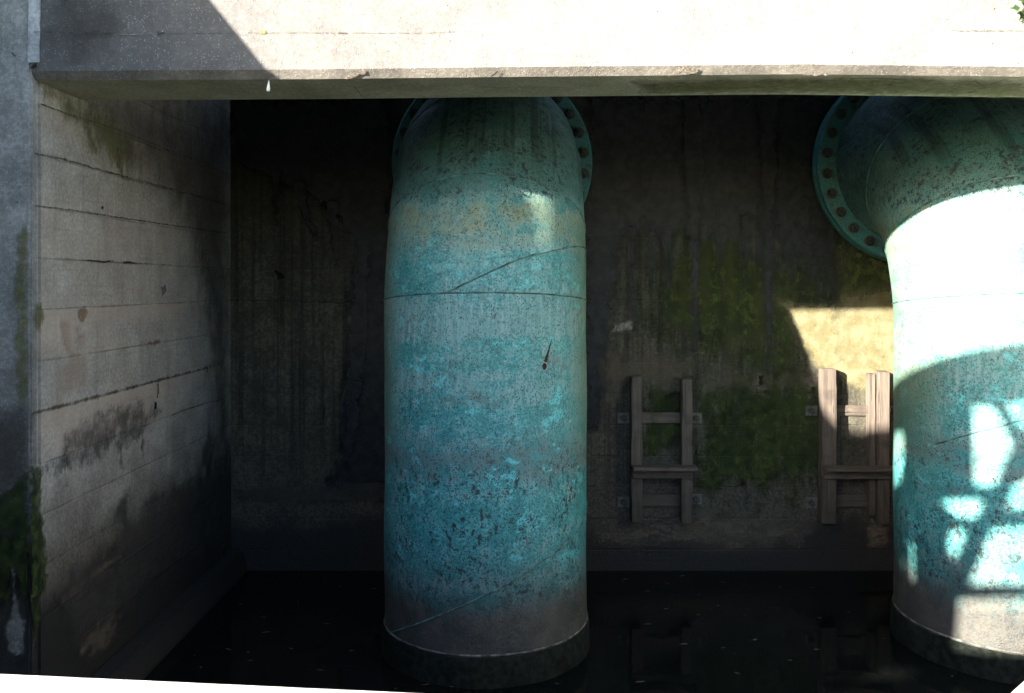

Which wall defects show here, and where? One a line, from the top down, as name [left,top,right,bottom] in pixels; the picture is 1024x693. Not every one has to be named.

damp [47,402,147,470]
damp [63,98,394,653]
damp [583,95,840,430]
damp [0,601,26,675]